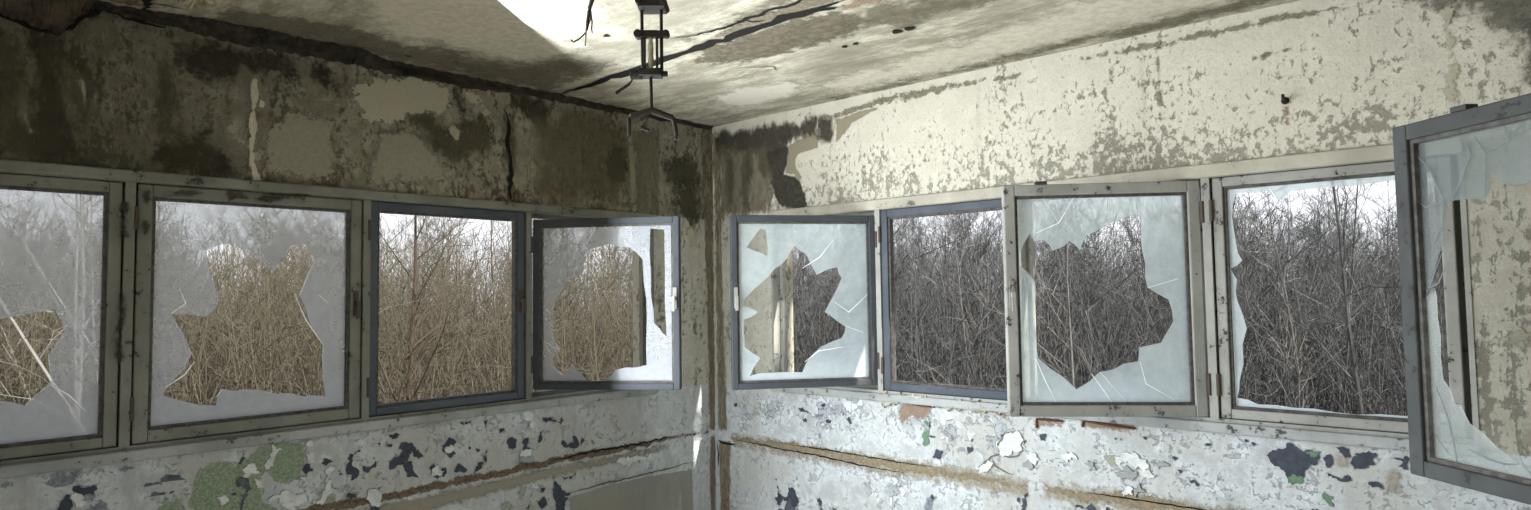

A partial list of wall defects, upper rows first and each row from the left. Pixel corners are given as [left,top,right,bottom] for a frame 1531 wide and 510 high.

crack [0,0,185,37]
crack [558,0,844,95]
leakage [831,0,1267,100]
leakage [1423,0,1531,104]
leakage [214,10,635,204]
crack [503,108,514,201]
leakage [712,115,833,217]
peeling [144,417,587,510]
peeling [775,478,799,510]
peeling [880,390,1063,474]
peeling [1061,420,1199,510]
peeling [1244,439,1409,510]